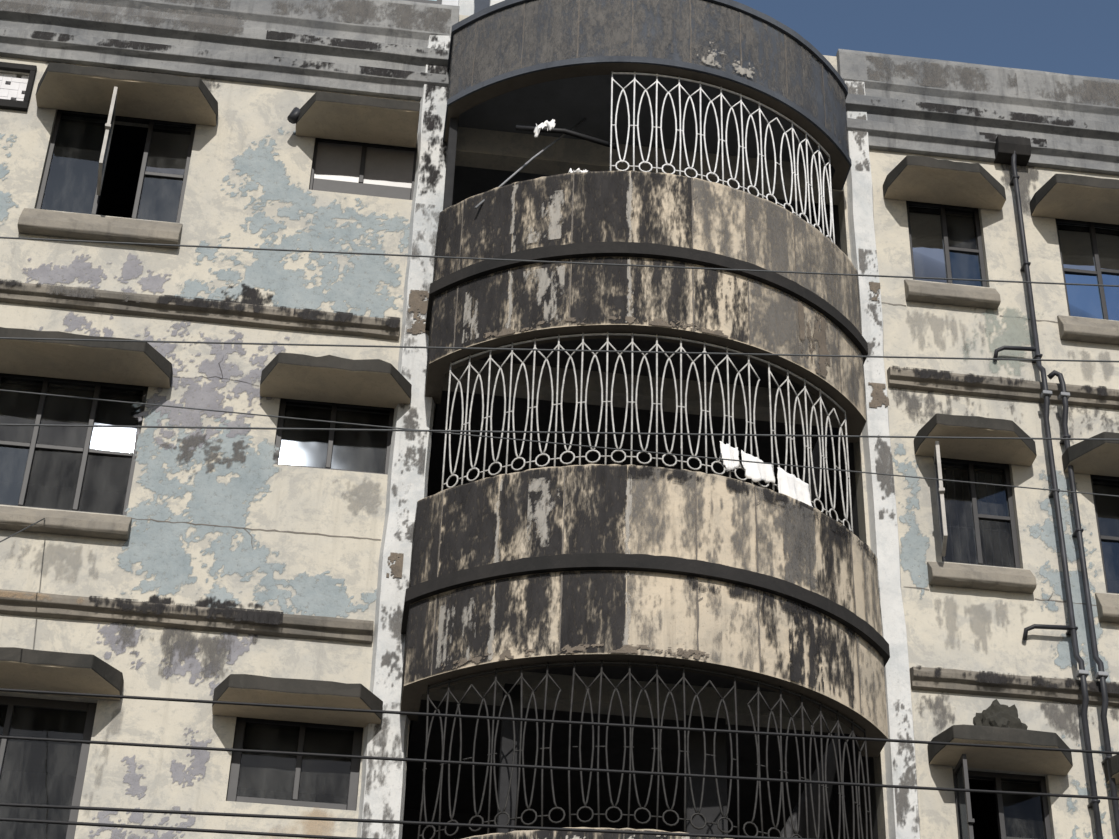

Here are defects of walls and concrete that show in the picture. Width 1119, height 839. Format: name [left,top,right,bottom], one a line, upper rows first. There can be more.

peeling [23,127,429,337]
leakage [156,0,988,407]
leakage [891,308,1034,419]
peeling [88,755,196,839]
leakage [89,594,283,676]
peeling [170,728,212,788]
peeling [113,321,377,618]
crack [132,518,381,548]
leakage [361,570,661,839]
leakage [392,403,882,631]
leakage [679,575,955,832]
peeling [892,443,932,599]